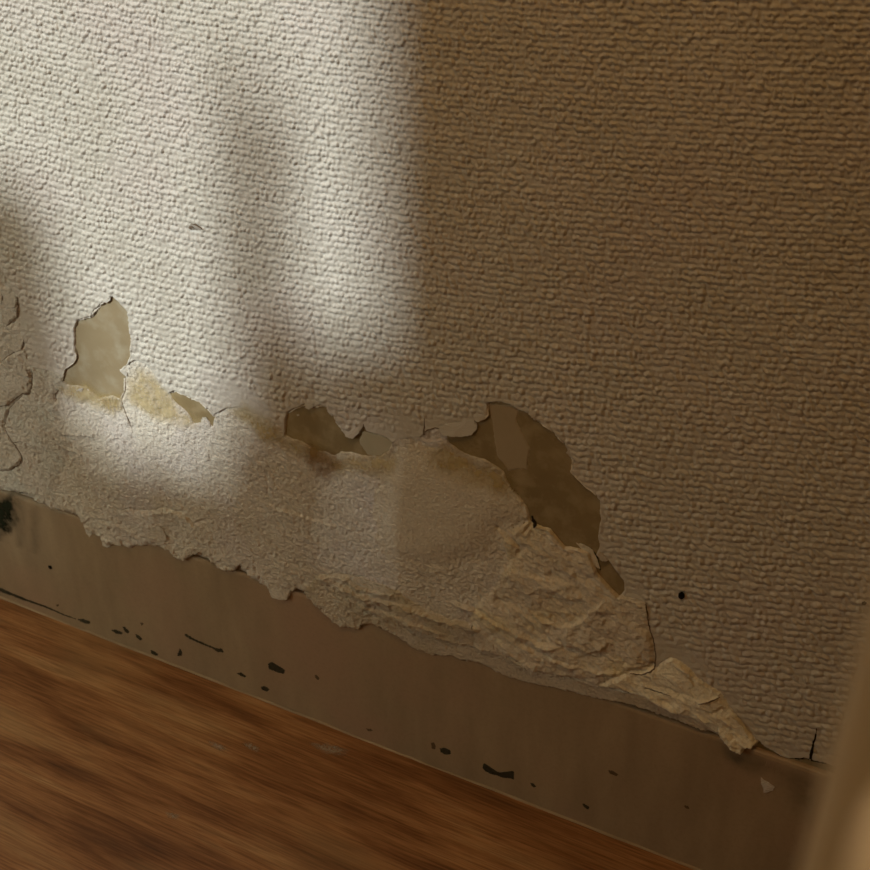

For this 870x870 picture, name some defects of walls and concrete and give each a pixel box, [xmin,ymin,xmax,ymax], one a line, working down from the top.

flaking render [0,269,131,509]
peeling [170,391,215,426]
peeling [286,403,392,456]
leakage [0,498,13,532]
flaking render [304,401,759,755]
peeling [268,662,285,674]
crack [630,604,671,697]
crack [795,728,827,765]